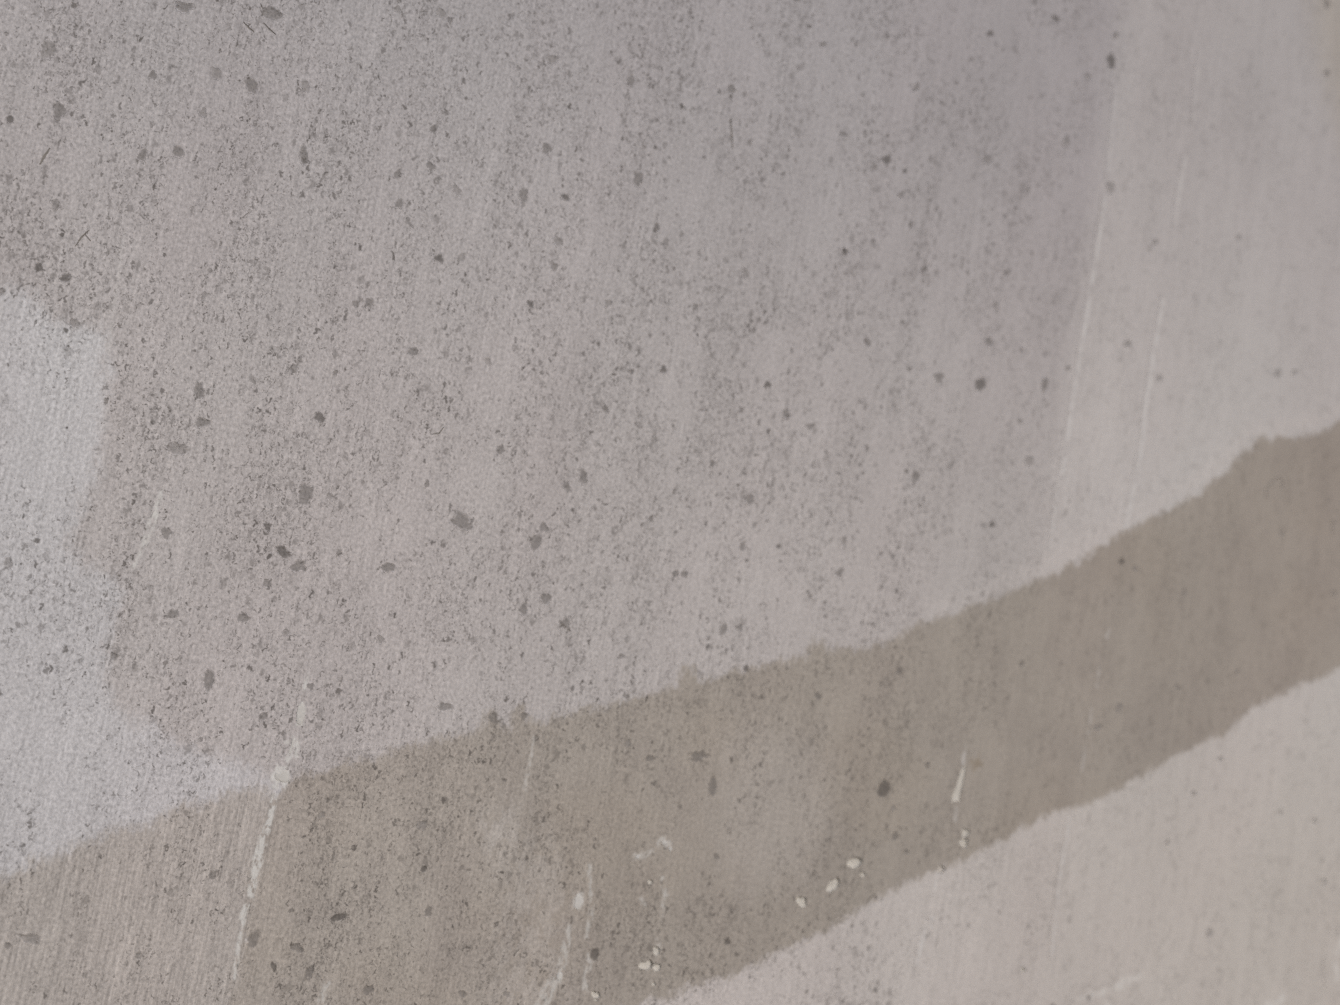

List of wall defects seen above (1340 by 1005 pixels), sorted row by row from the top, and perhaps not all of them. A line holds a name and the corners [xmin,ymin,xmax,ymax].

damp [0,754,281,1005]
damp [0,0,1173,796]
damp [205,387,1340,1005]